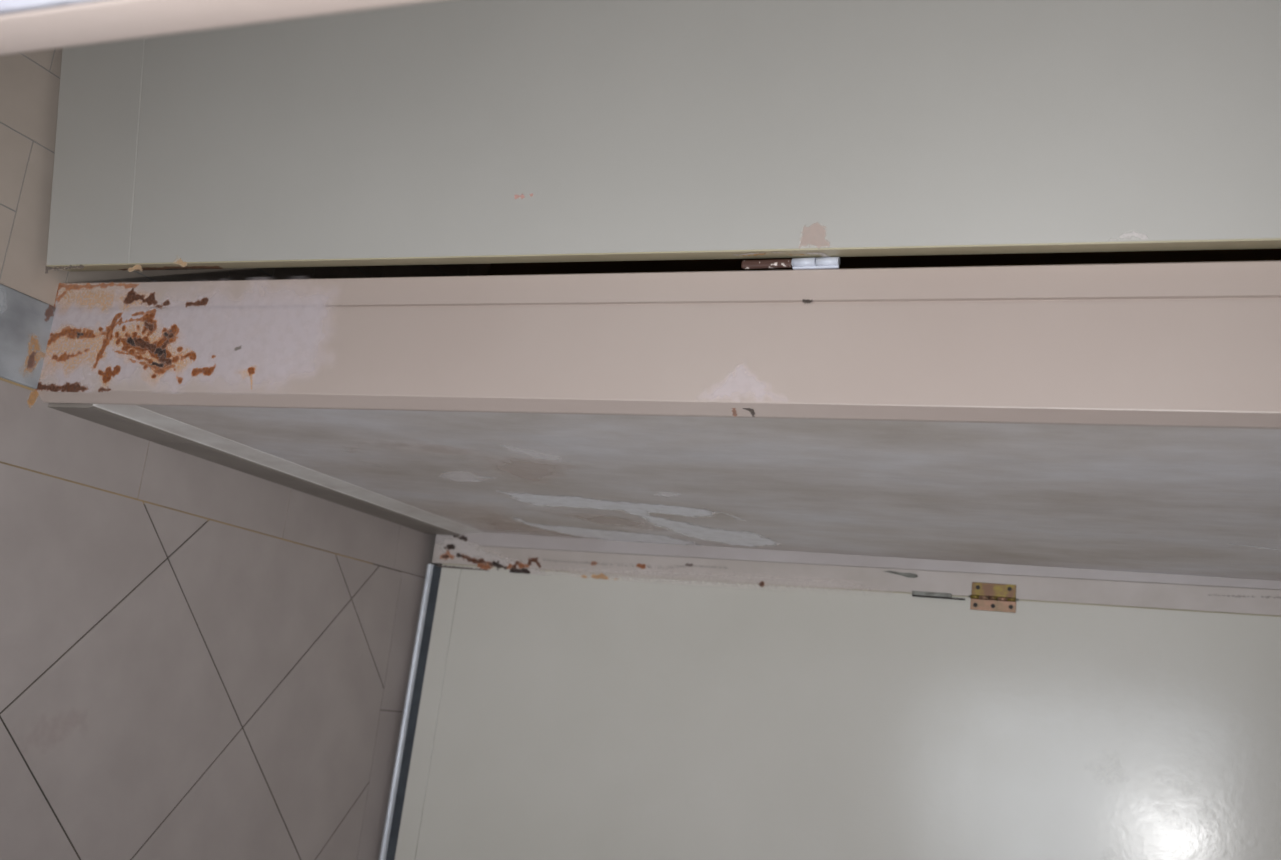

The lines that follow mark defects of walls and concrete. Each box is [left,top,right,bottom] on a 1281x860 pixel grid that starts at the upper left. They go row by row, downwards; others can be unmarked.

rust [25,259,222,408]
flaking render [499,491,778,547]
rust [438,535,546,575]